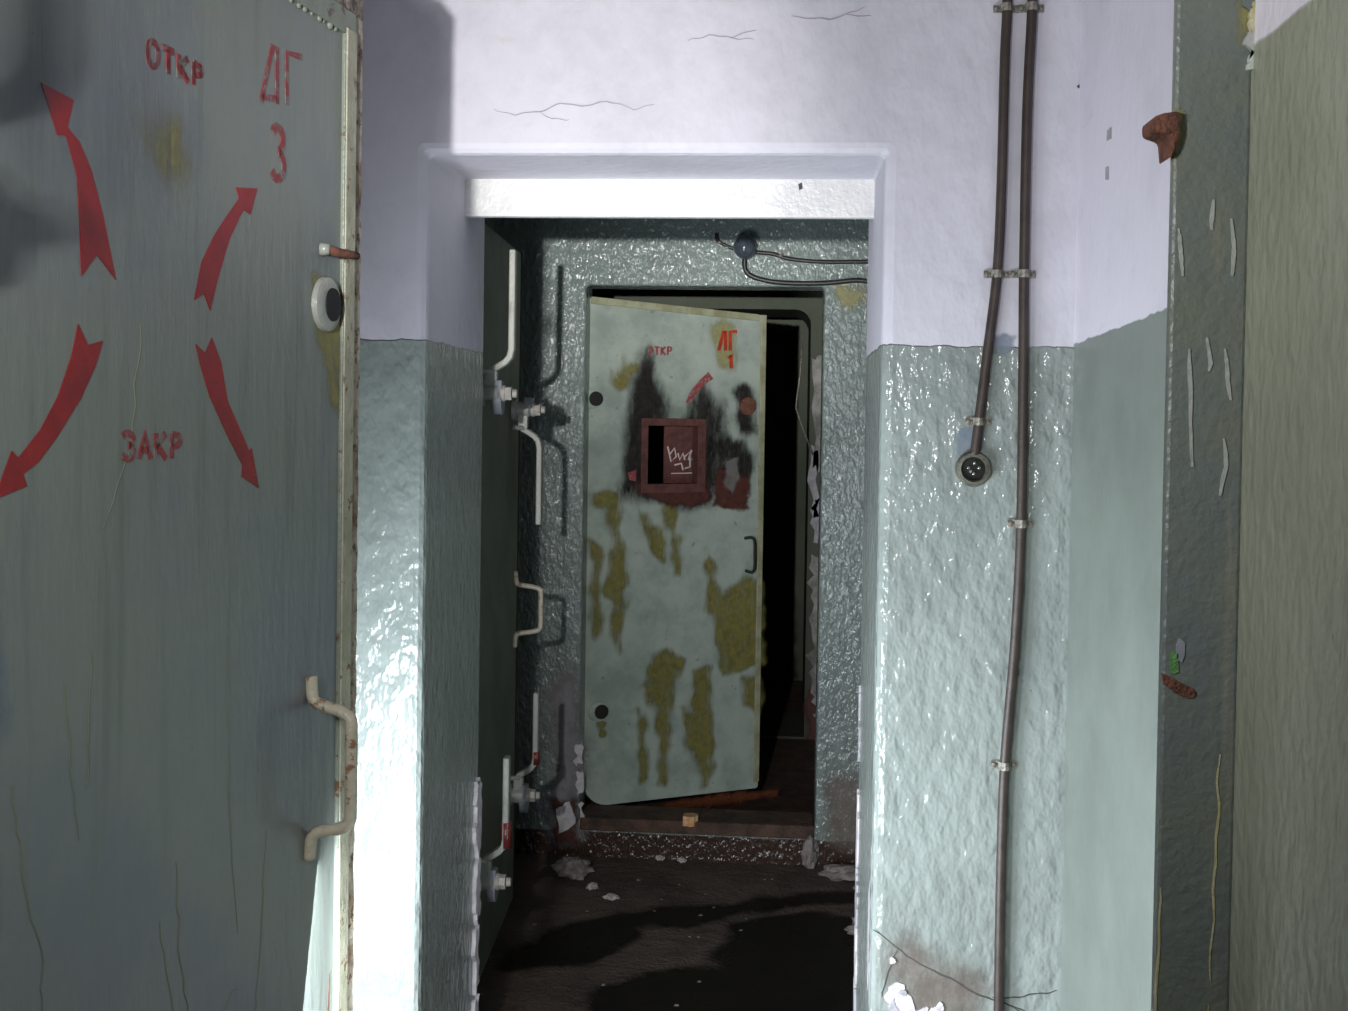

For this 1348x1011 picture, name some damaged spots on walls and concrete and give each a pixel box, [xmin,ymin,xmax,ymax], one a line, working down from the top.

crack [688,30,757,41]
crack [794,7,869,20]
peeling [1240,0,1256,71]
crack [494,101,654,121]
flaking render [804,355,822,740]
flaking render [853,789,980,1011]